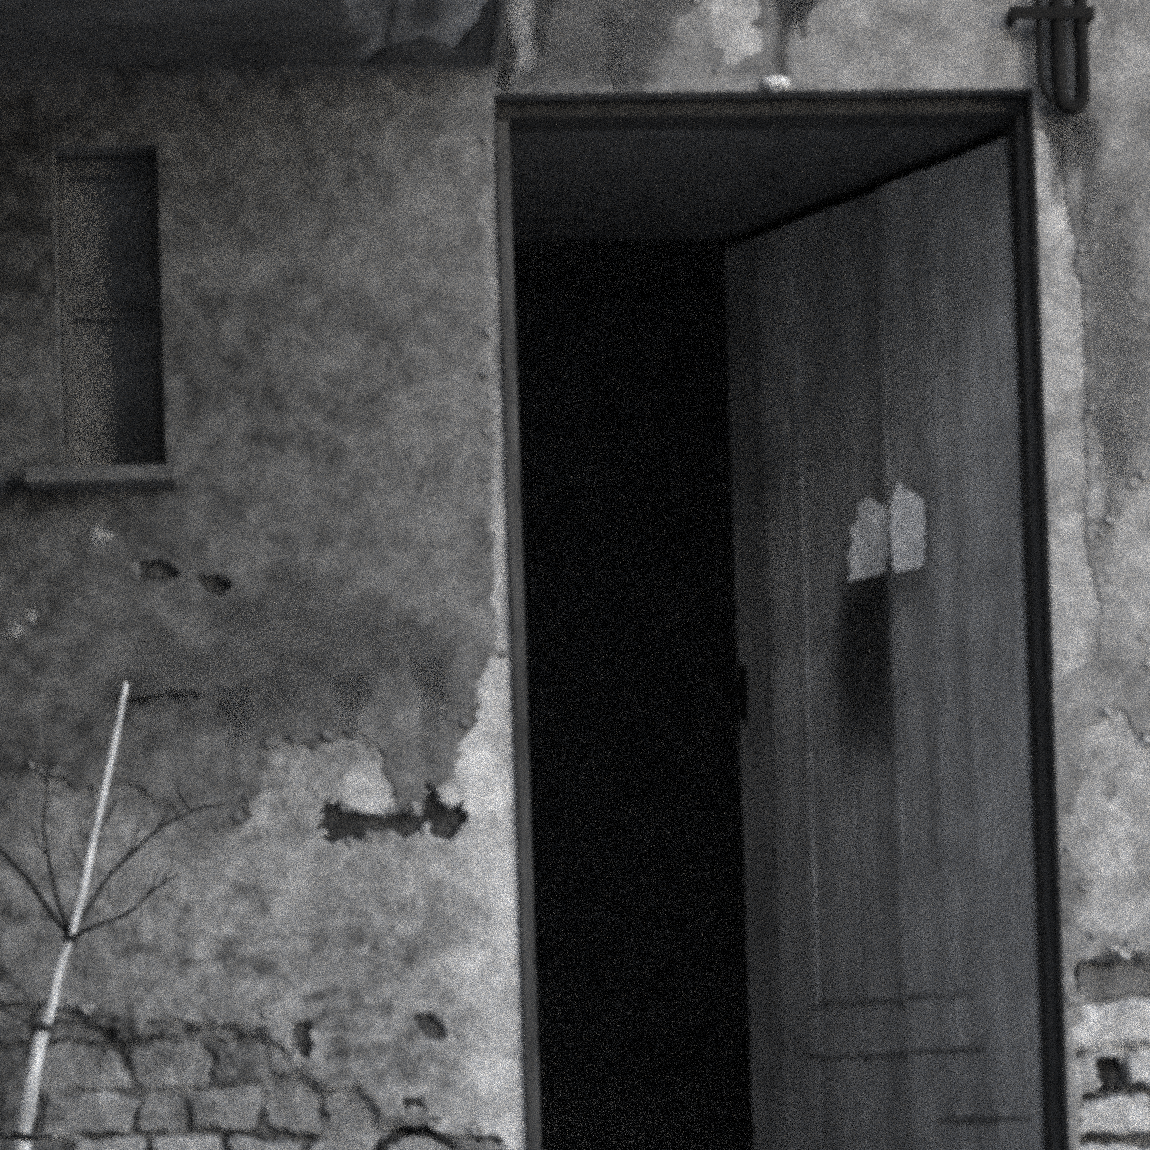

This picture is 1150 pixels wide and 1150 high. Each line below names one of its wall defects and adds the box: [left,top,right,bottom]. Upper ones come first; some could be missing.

flaking render [345,0,487,60]
flaking render [0,136,526,1150]
flaking render [1067,704,1150,1150]